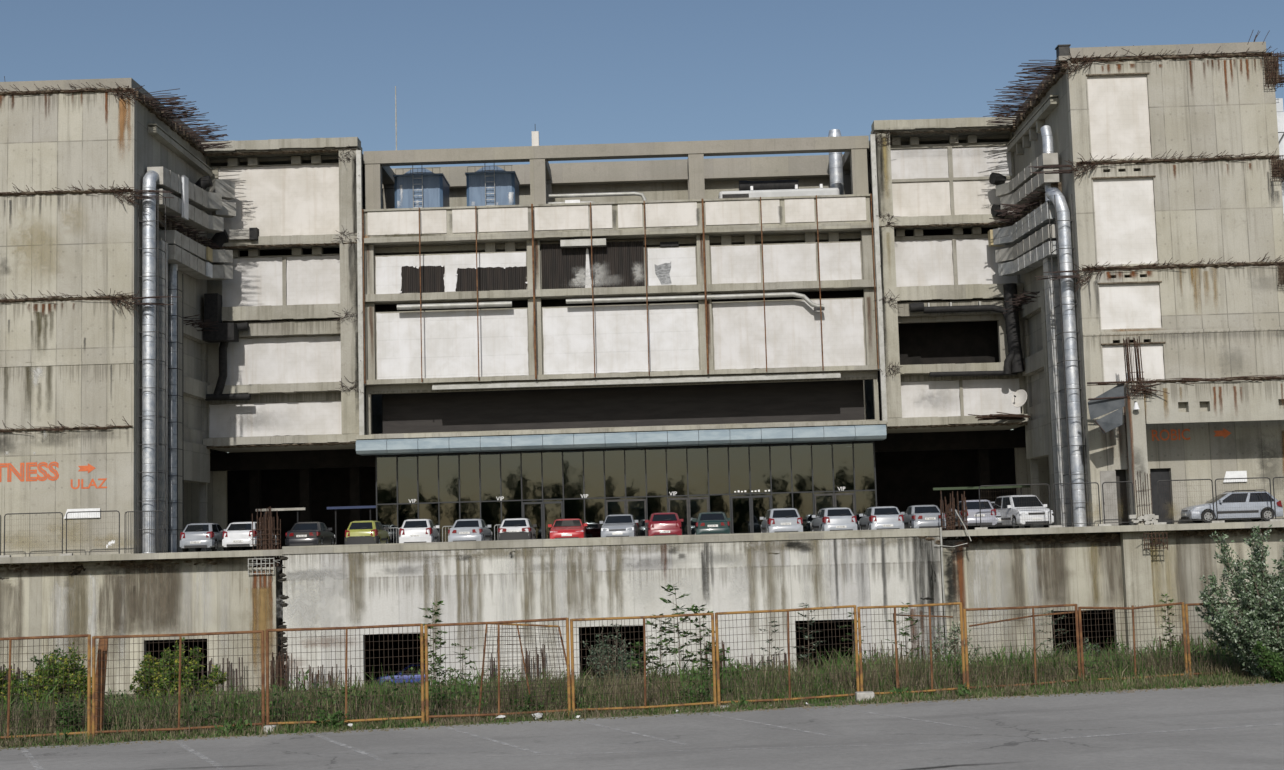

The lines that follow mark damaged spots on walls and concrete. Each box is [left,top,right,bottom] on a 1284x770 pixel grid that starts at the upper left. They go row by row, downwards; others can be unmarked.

corrosion [1207,59,1261,91]
corrosion [105,92,130,146]
damp [36,312,47,342]
damp [57,565,176,647]
damp [349,552,359,608]
damp [457,552,479,620]
damp [524,547,621,632]
damp [701,545,709,591]
damp [747,545,784,614]
damp [813,539,838,601]
damp [1036,541,1063,600]
damp [1098,538,1120,591]